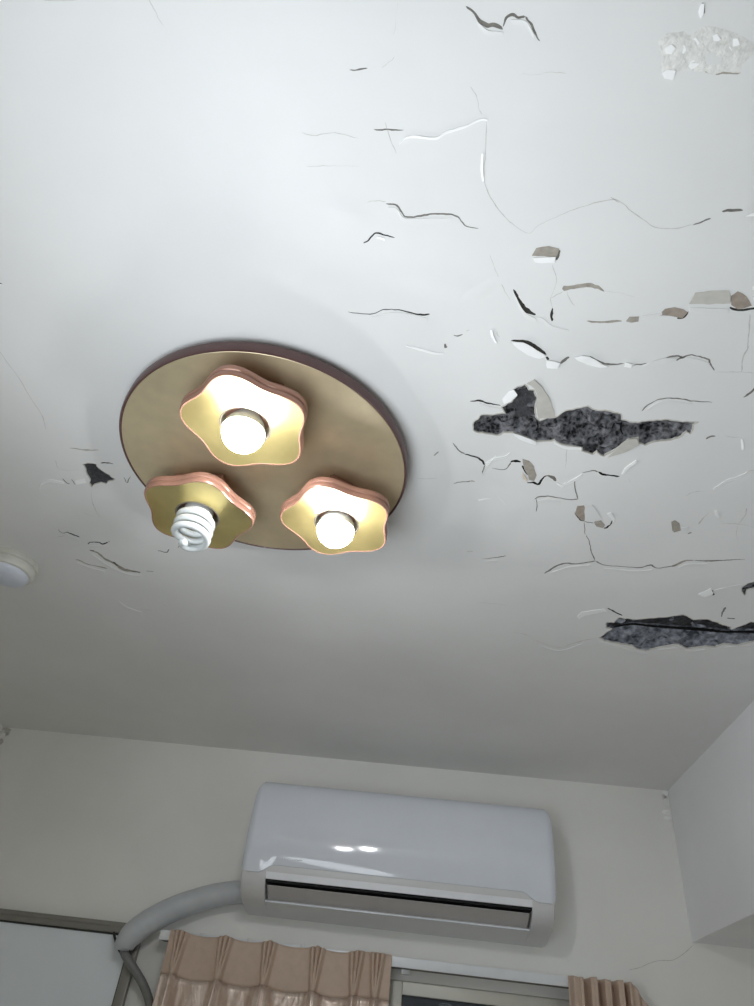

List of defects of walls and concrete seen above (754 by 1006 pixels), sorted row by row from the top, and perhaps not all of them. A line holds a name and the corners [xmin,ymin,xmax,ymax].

crack [466,6,540,41]
peeling [658,3,754,80]
crack [304,88,693,233]
crack [364,200,479,243]
crack [490,256,568,333]
peeling [588,287,754,323]
crack [471,400,501,412]
spalling [472,380,699,458]
spalling [40,462,130,489]
crack [419,443,511,484]
crack [535,451,637,511]
spalling [577,608,754,656]